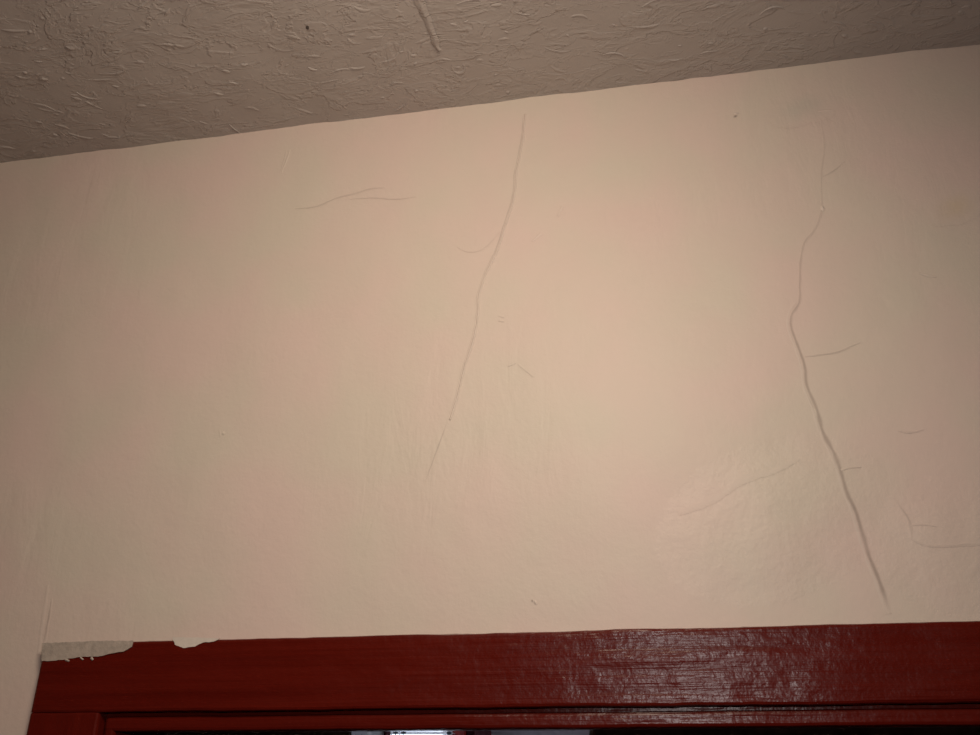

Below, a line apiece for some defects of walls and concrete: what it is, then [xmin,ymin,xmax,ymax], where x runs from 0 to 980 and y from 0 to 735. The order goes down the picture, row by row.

crack [786,119,892,614]
peeling [41,640,133,662]
peeling [172,637,220,648]